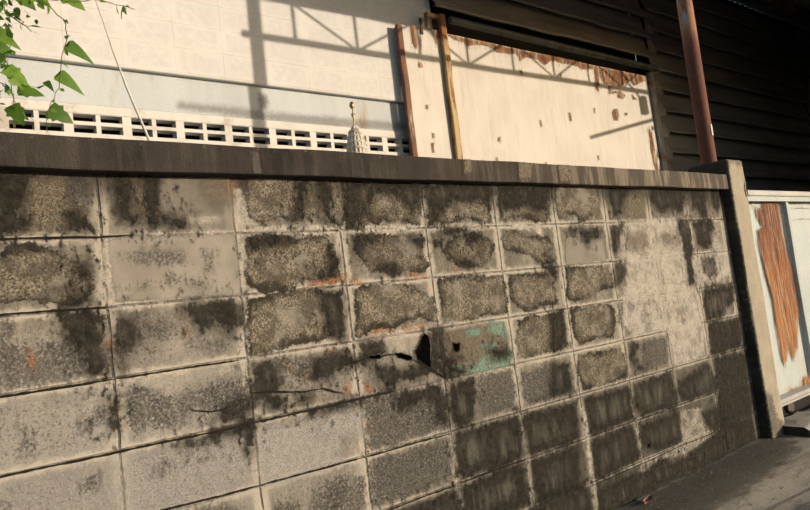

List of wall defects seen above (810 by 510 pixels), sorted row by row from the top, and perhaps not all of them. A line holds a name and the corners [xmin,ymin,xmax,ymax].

rust [411,25,422,48]
rust [432,29,645,100]
peeling [239,178,630,390]
rust [754,202,800,367]
crack [347,354,396,365]
water stain [0,162,760,510]
crack [414,360,458,379]
crack [0,388,396,478]